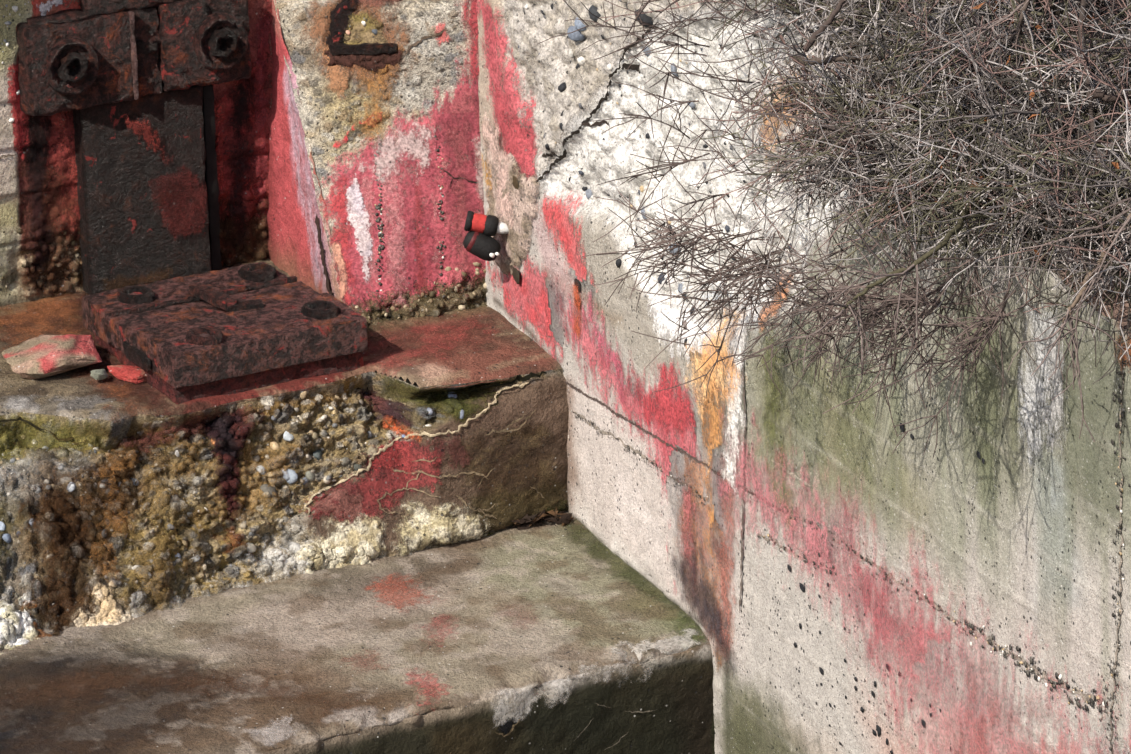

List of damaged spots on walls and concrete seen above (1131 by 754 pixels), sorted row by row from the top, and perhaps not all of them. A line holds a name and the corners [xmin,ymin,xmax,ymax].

rust [220,79,267,267]
rust [305,0,407,133]
crack [536,22,657,183]
crack [0,417,86,445]
crack [304,342,785,612]
water stain [671,551,730,667]